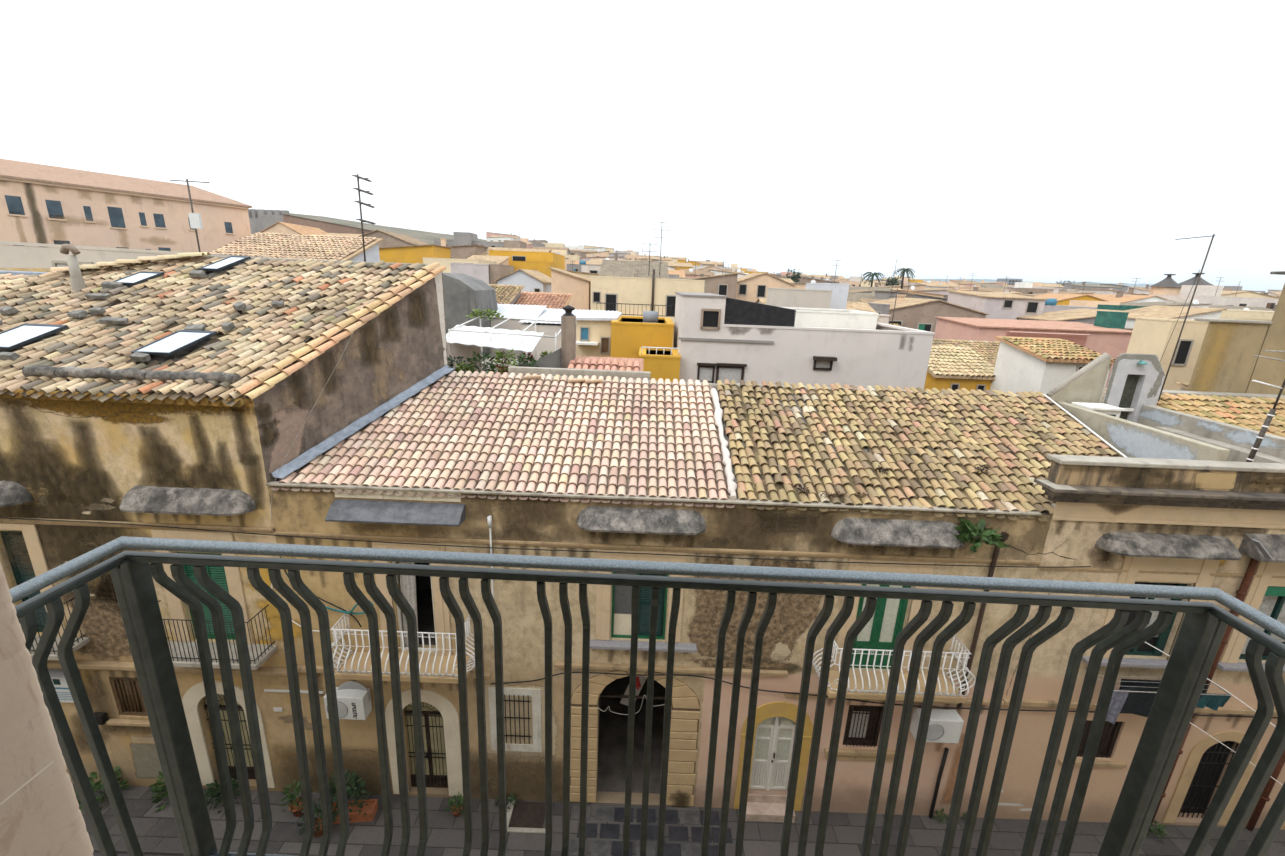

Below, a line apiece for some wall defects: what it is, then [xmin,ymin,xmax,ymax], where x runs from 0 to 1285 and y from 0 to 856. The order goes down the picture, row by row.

water stain [142,293,425,508]
water stain [0,407,152,750]
peeling [685,555,824,670]